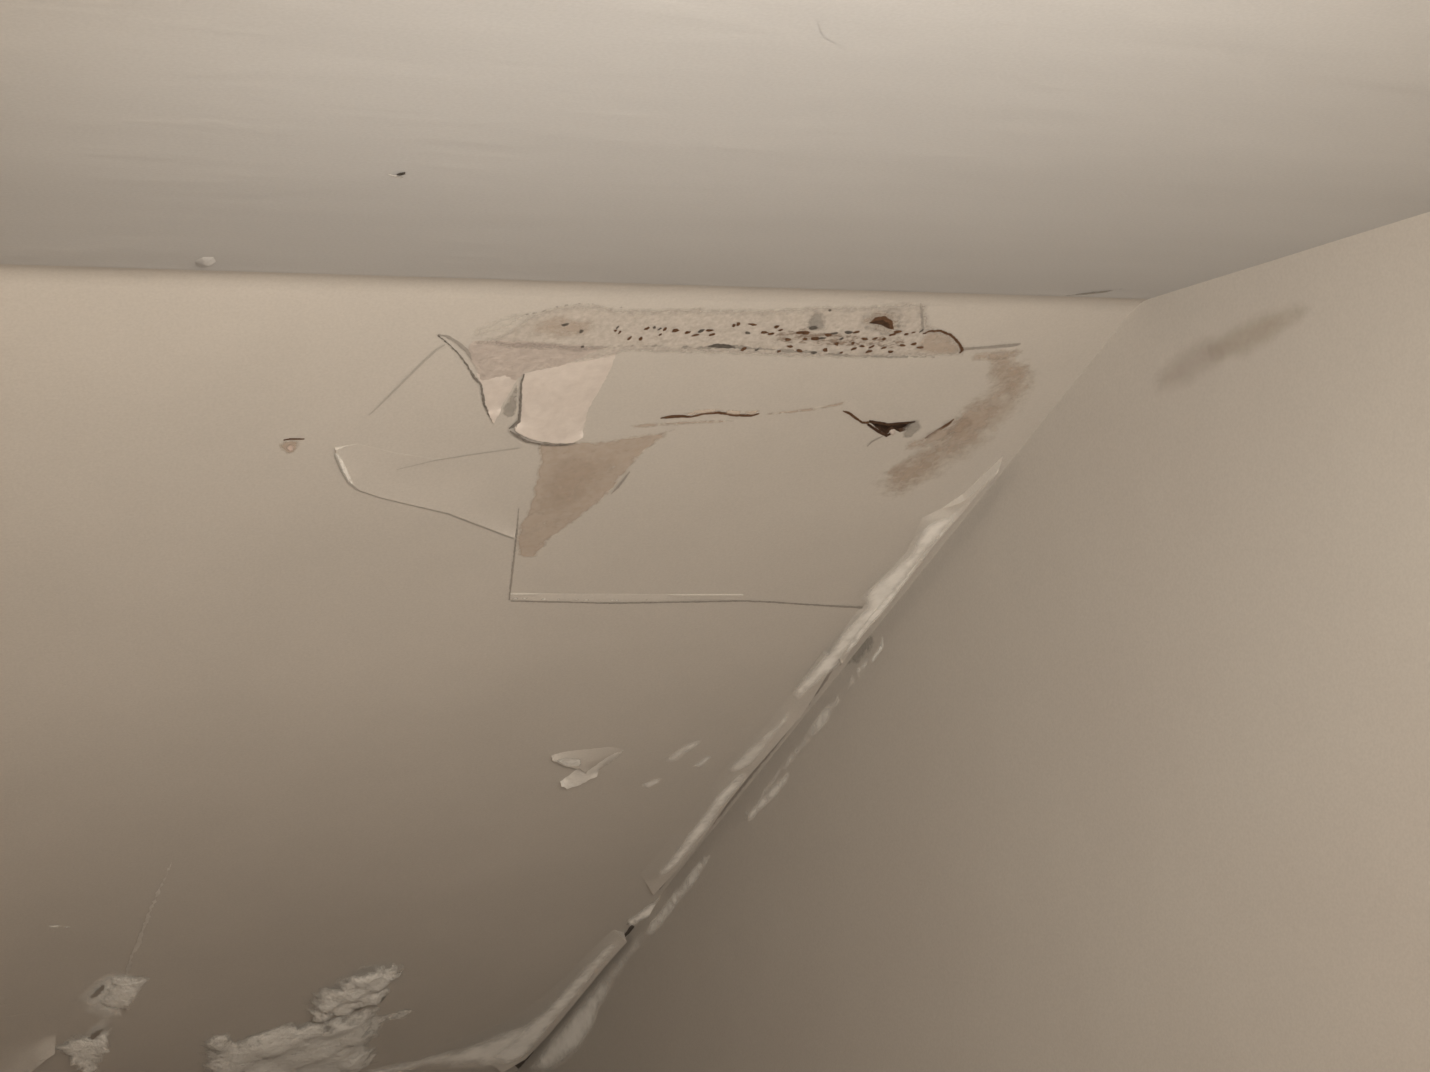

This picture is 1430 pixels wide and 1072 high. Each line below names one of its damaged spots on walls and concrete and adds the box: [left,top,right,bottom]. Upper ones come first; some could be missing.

peeling [438,305,964,447]
crack [638,403,842,427]
damp [519,435,662,556]
peeling [435,456,1003,1072]
peeling [57,1029,109,1072]
peeling [91,977,147,1008]